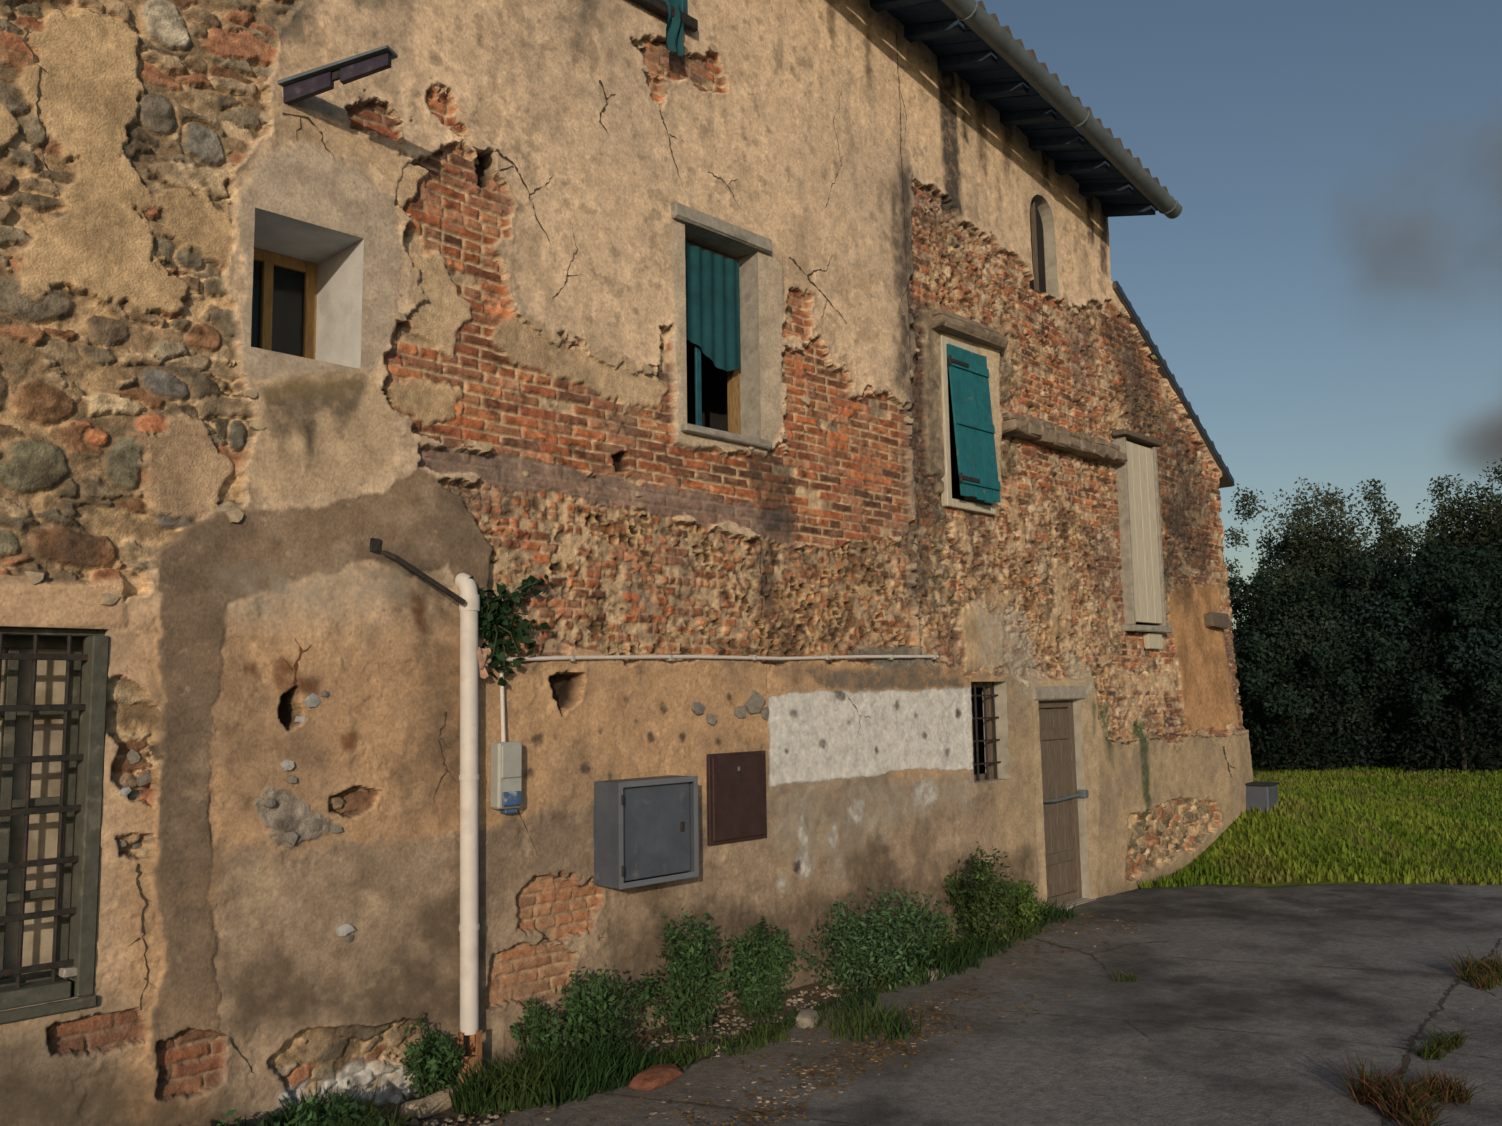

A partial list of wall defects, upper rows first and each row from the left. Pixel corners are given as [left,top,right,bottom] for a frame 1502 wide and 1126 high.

spalling [630,33,729,110]
crack [493,149,583,298]
spalling [345,84,1244,747]
spalling [278,686,329,727]
crack [127,857,149,1018]
spalling [483,870,605,1007]
spalling [47,1007,228,1098]